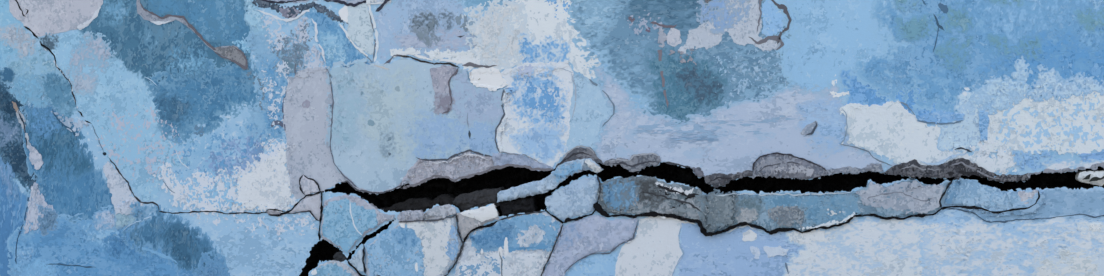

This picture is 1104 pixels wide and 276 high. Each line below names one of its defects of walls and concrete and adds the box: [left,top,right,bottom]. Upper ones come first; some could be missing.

peeling [136,0,202,40]
peeling [669,0,752,55]
peeling [761,0,789,37]
peeling [165,44,209,79]
peeling [713,51,762,85]
crack [109,158,1104,276]